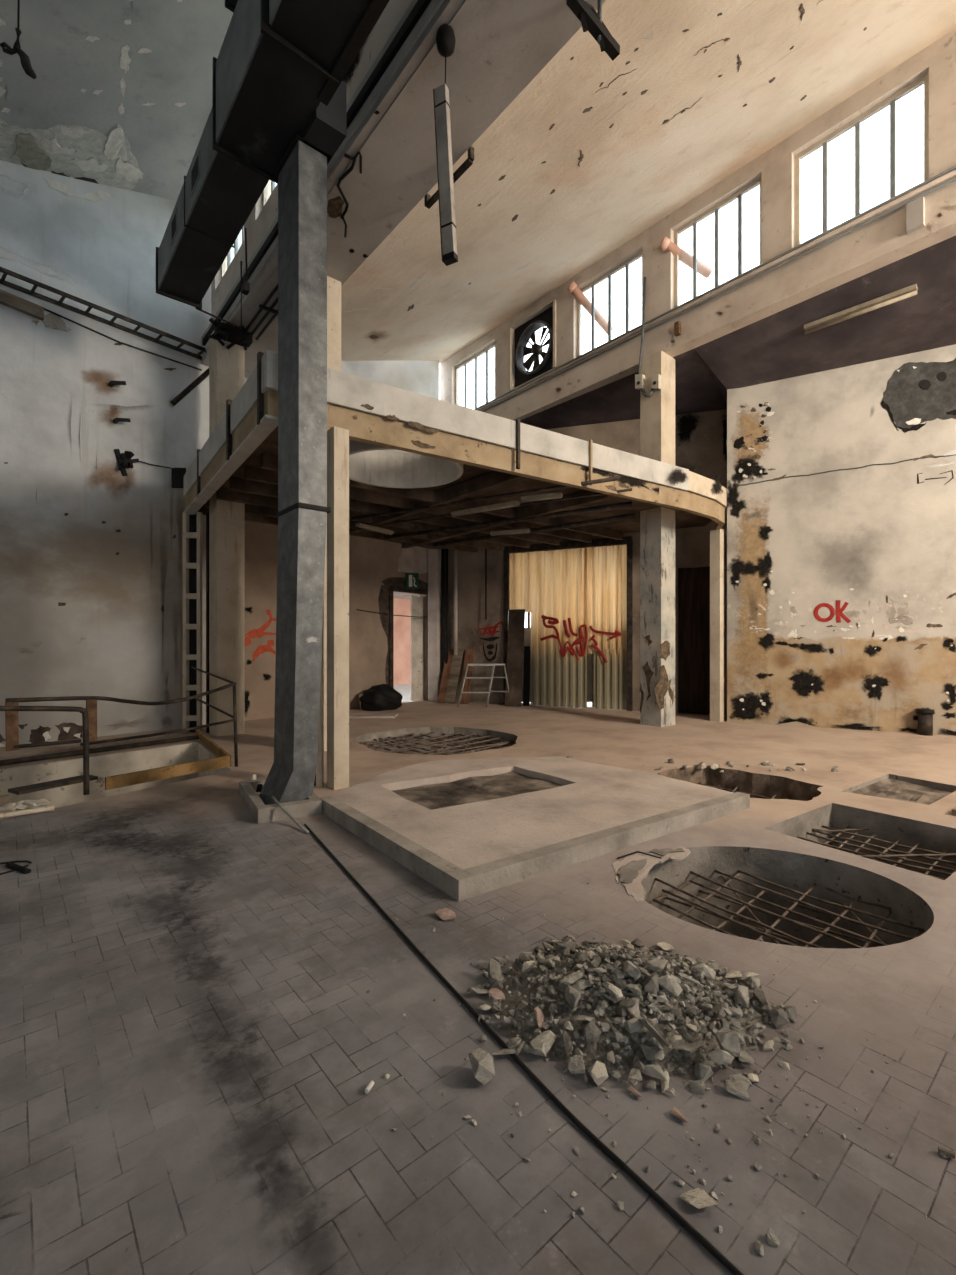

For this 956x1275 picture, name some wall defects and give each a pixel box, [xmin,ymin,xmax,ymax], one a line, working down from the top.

crack [799,0,822,21]
peeling [0,45,152,190]
spalling [881,359,956,433]
peeling [734,402,775,475]
peeling [639,635,674,713]
spalling [612,766,956,949]